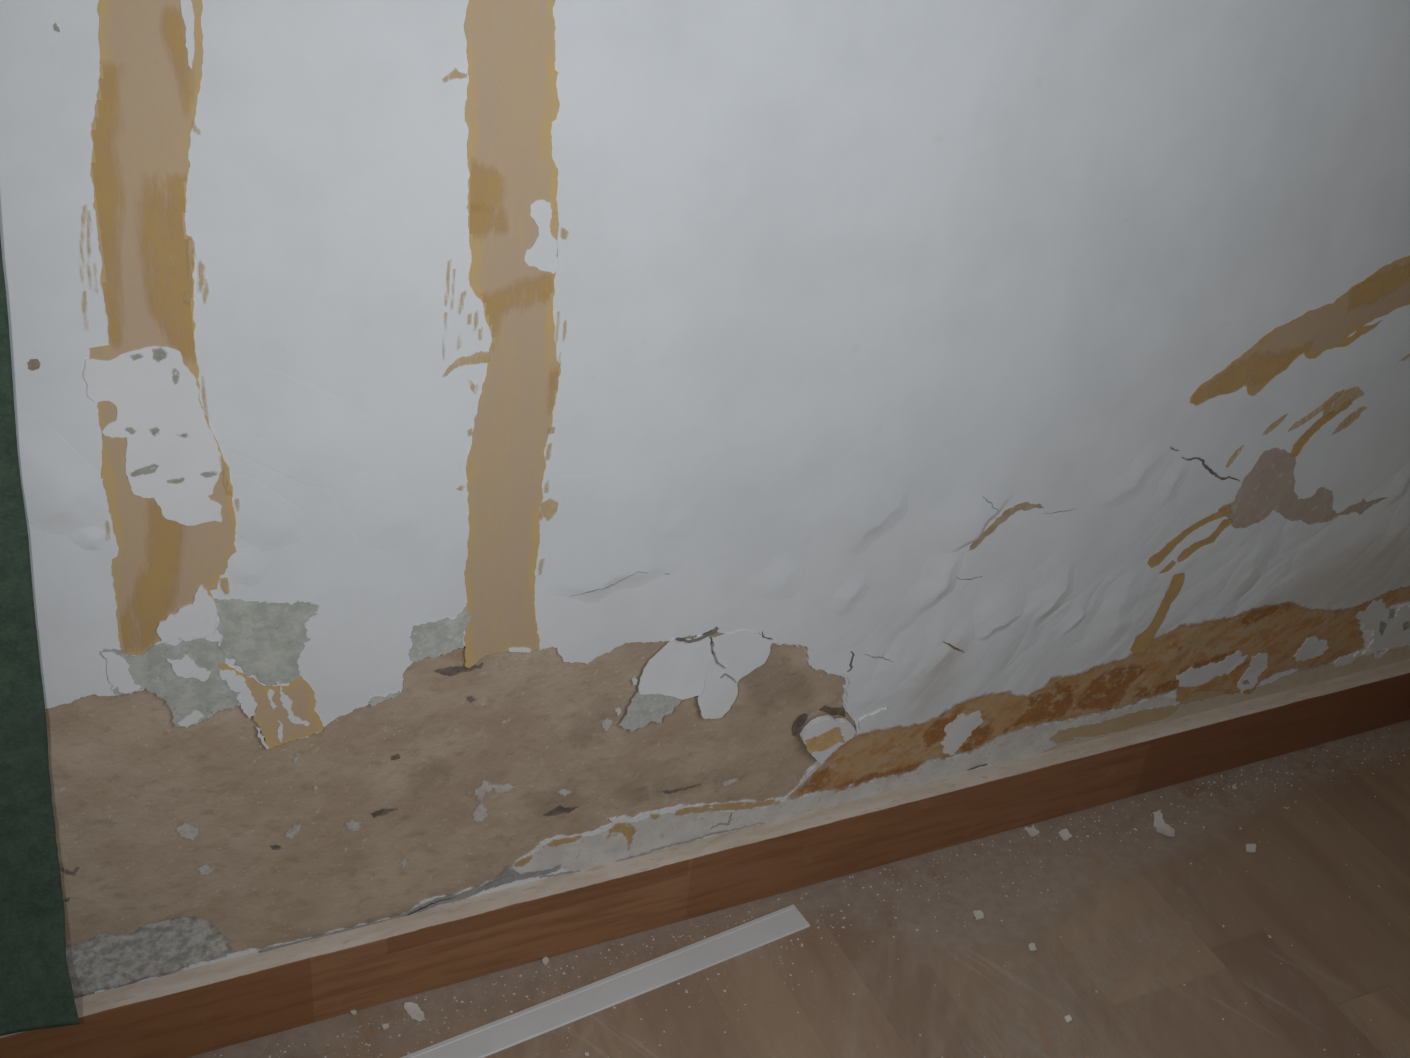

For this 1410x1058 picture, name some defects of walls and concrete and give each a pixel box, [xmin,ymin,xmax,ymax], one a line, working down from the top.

peeling [1189,256,1410,406]
crack [1171,447,1241,482]
flaking render [45,0,856,998]
peeling [970,502,1044,550]
crack [676,626,737,683]
flaking render [1058,828,1072,841]